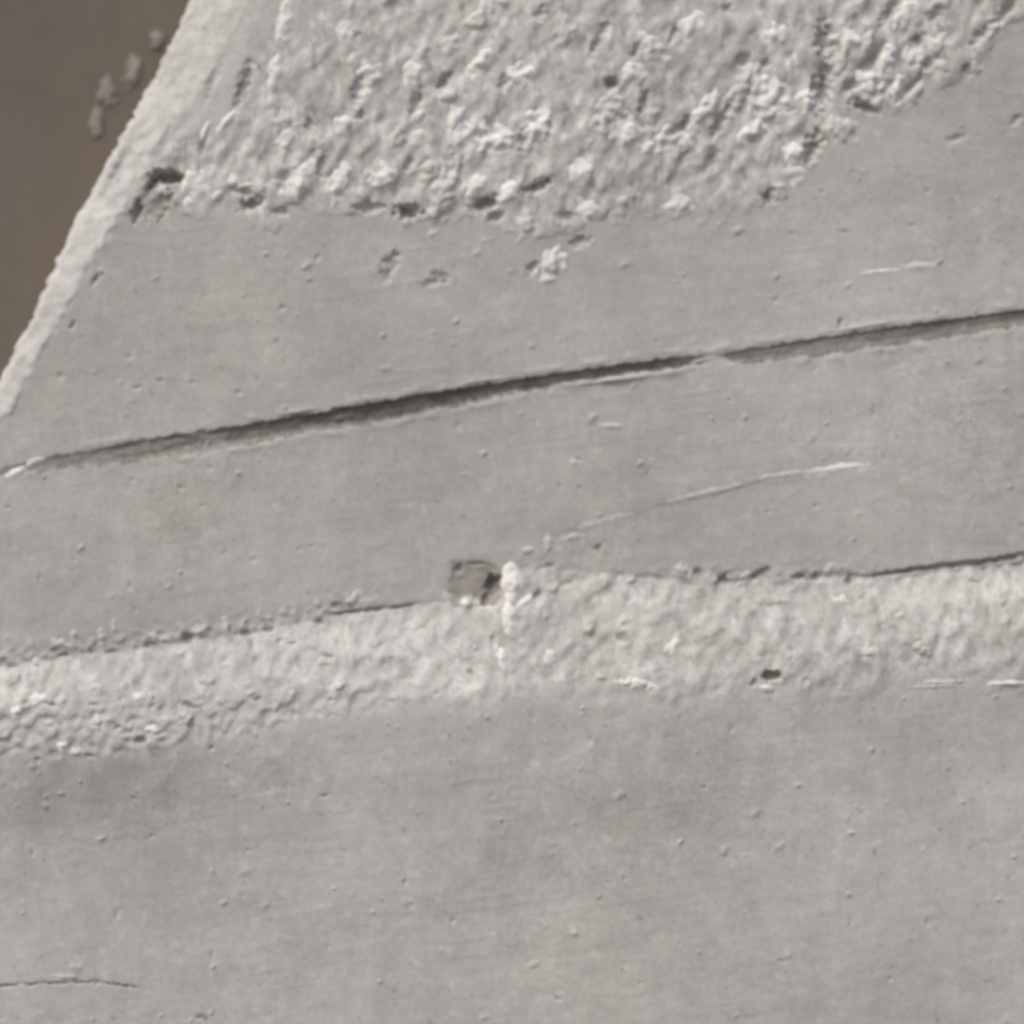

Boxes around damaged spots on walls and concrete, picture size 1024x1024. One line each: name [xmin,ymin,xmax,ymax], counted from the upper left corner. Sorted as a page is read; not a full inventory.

spalling [123,0,1024,283]
crack [0,309,1024,479]
crack [694,567,815,586]
crack [843,552,1024,585]
spalling [442,575,499,611]
crack [330,602,419,616]
spalling [141,623,208,649]
spalling [594,671,658,691]
spalling [750,671,780,694]
spalling [11,691,67,719]
spalling [122,721,158,743]
spalling [53,741,84,758]